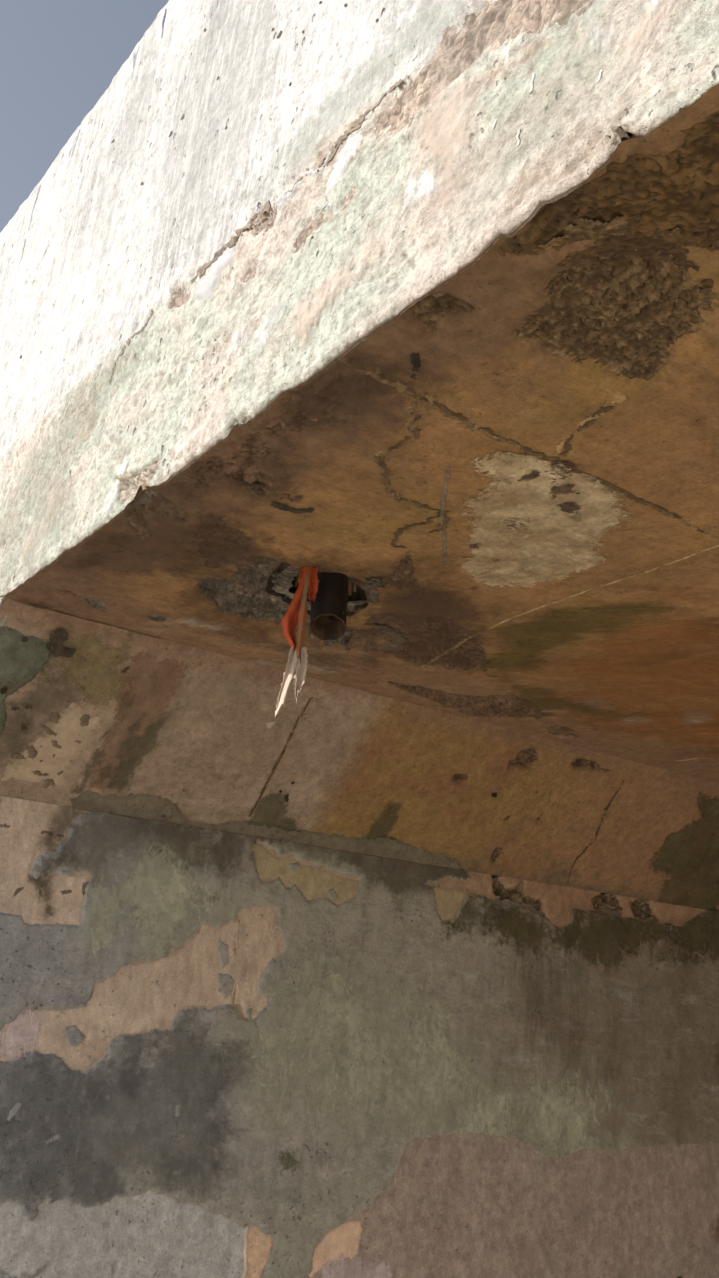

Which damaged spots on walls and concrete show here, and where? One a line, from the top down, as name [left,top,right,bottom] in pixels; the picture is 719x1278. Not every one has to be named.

spalling [496,111,719,300]
spalling [197,553,407,651]
crack [344,360,719,565]
damp [389,585,675,723]
damp [461,452,627,591]
peeling [0,702,110,925]
peeling [0,905,285,1072]
damp [0,1038,147,1207]
peeling [242,1225,273,1278]
peeling [309,1221,391,1278]